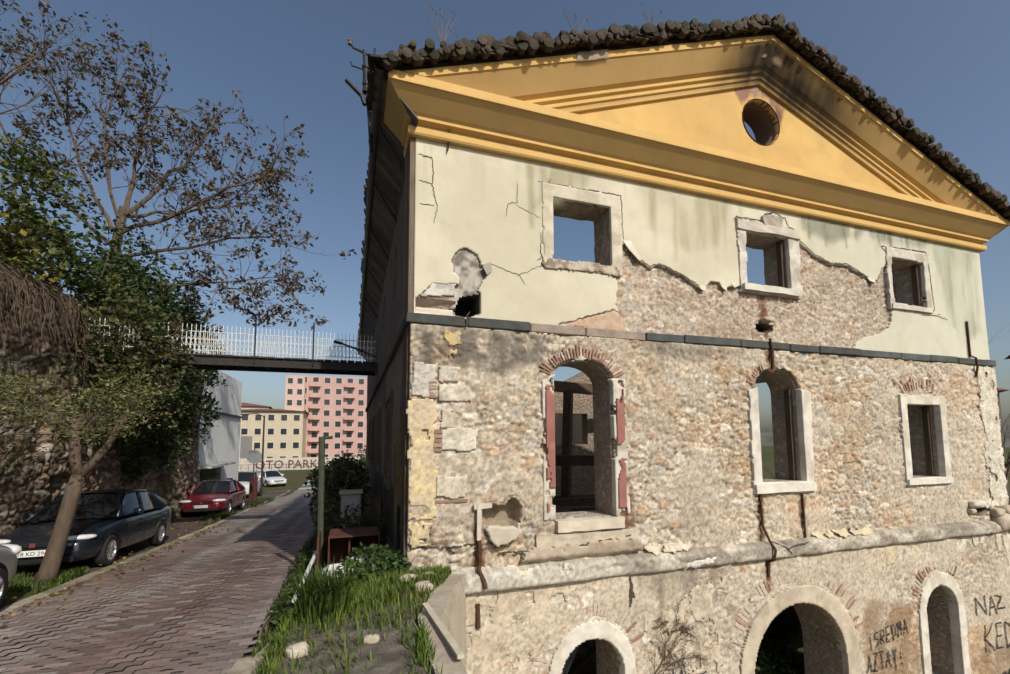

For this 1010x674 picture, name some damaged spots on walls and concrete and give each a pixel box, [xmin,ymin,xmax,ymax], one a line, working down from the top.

crack [421,154,438,220]
crack [493,179,624,282]
flaking render [415,248,492,316]
flaking render [541,241,891,348]
rust [473,524,485,567]
spalling [482,498,523,548]